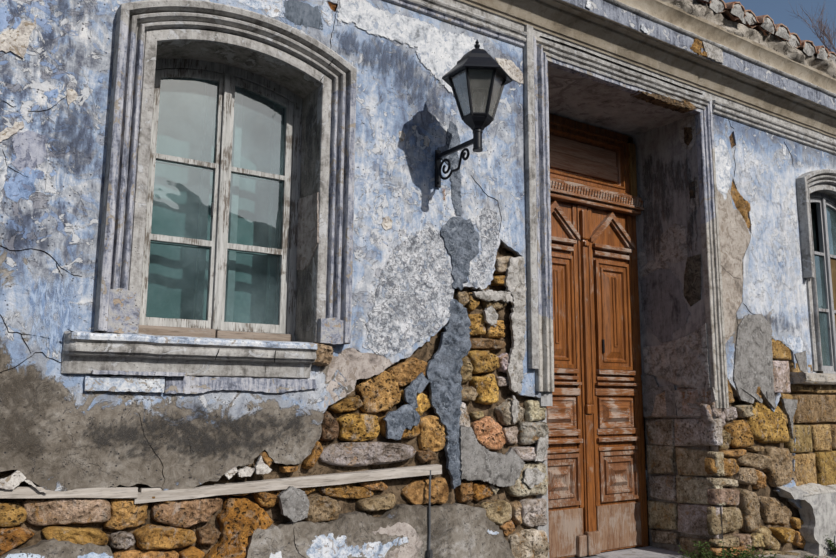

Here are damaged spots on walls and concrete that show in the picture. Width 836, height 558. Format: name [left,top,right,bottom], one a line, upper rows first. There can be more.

peeling [0,0,38,59]
peeling [236,0,485,94]
peeling [0,121,56,202]
crack [0,245,82,277]
spalling [684,254,702,307]
peeling [715,134,751,344]
crack [0,315,120,373]
leakage [0,374,63,455]
leakage [85,404,311,459]
spalling [198,226,550,558]
spalling [644,336,836,558]
spalling [0,469,290,558]